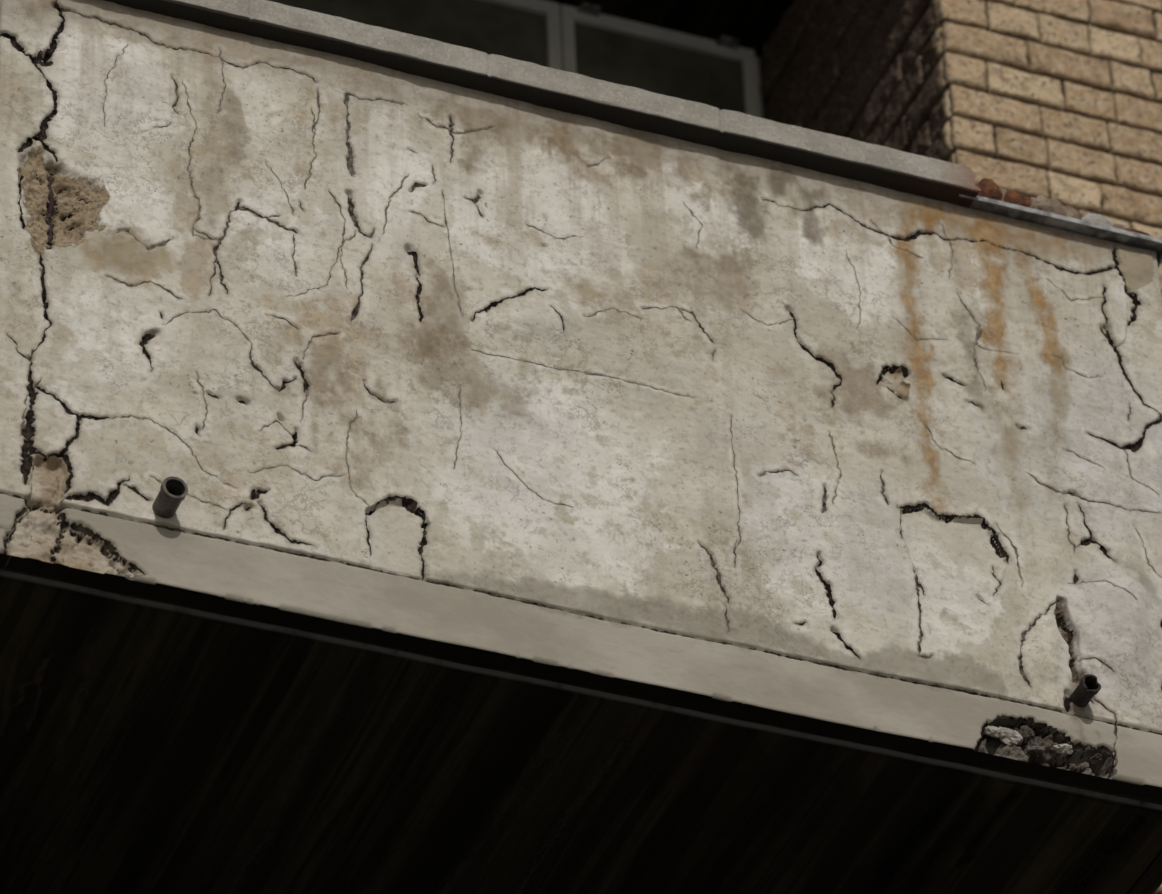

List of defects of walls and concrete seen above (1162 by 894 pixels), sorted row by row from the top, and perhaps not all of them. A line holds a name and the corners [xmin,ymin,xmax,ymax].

spalling [17,145,110,254]
crack [0,0,370,507]
crack [288,165,564,331]
water stain [735,173,762,238]
water stain [804,191,821,242]
corrosion [902,294,933,391]
crack [762,199,1114,408]
corrosion [971,222,1006,387]
corrosion [1031,286,1063,372]
spalling [3,454,145,578]
crack [0,251,1162,768]
spalling [974,715,1117,779]